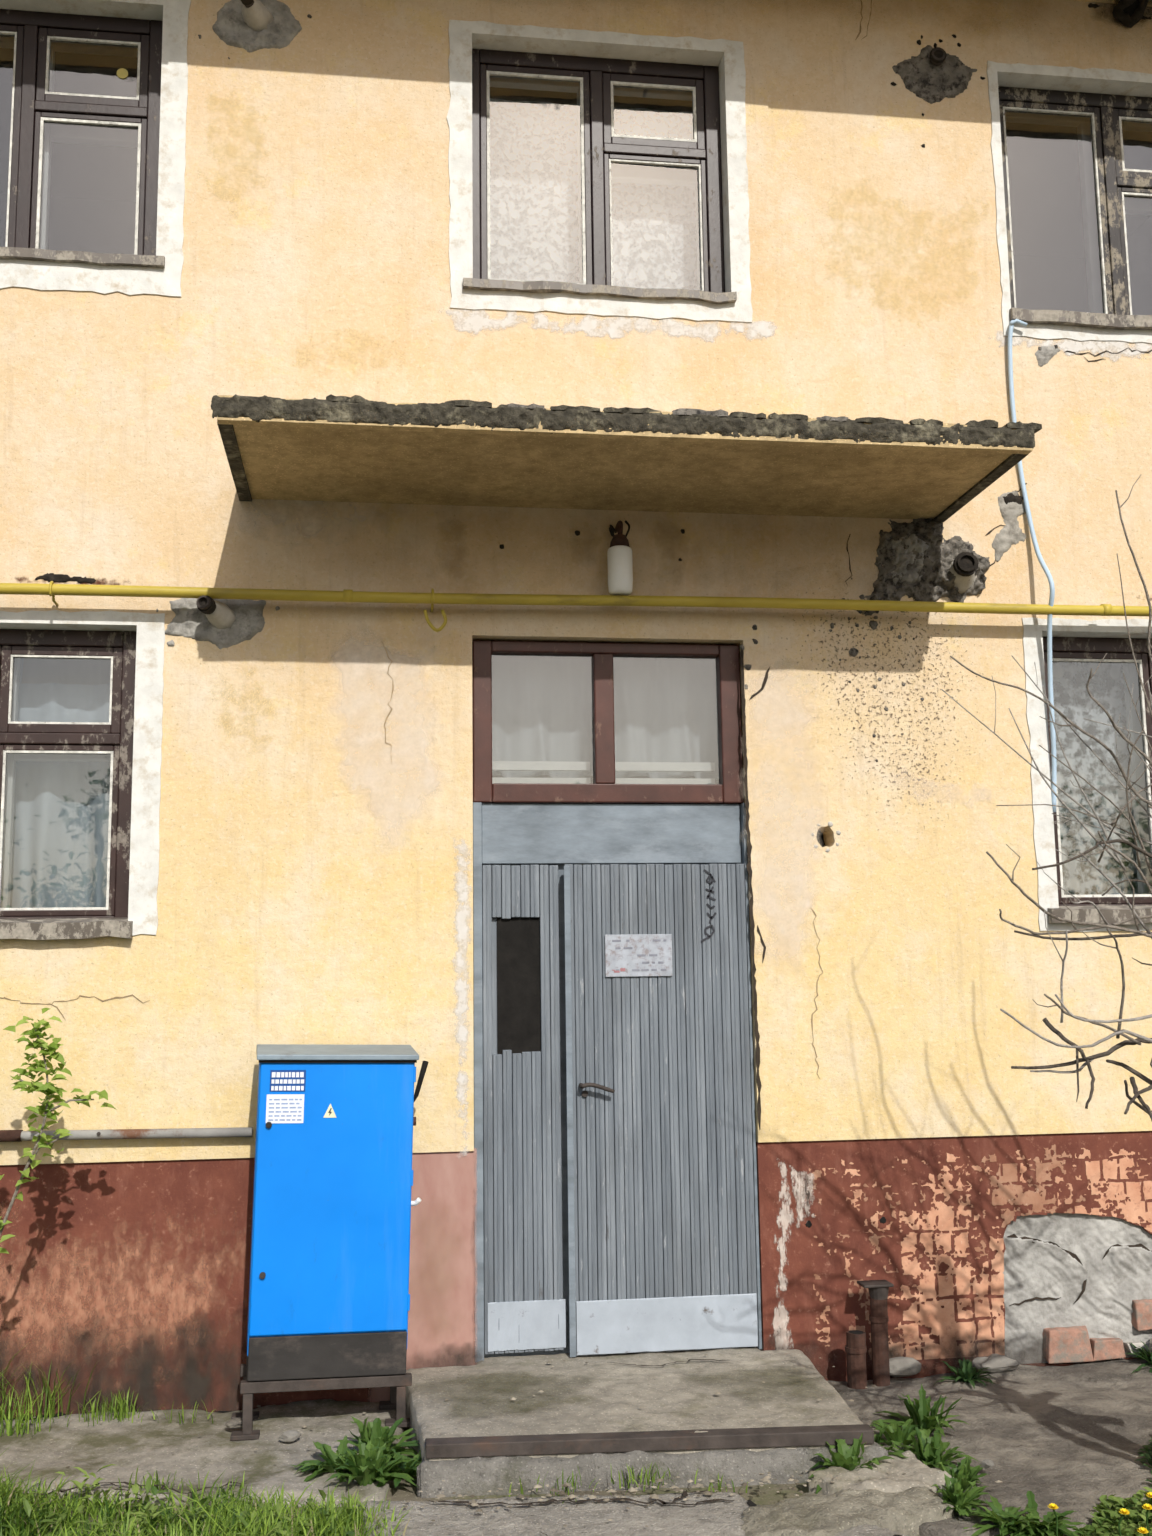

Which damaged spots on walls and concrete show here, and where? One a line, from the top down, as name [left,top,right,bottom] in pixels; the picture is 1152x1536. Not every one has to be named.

flaking render [1035,345,1060,367]
spalling [211,394,1042,448]
flaking render [842,491,1026,630]
crack [382,642,394,762]
crack [0,994,150,1019]
crack [811,910,823,1077]
peeling [772,1144,1152,1364]